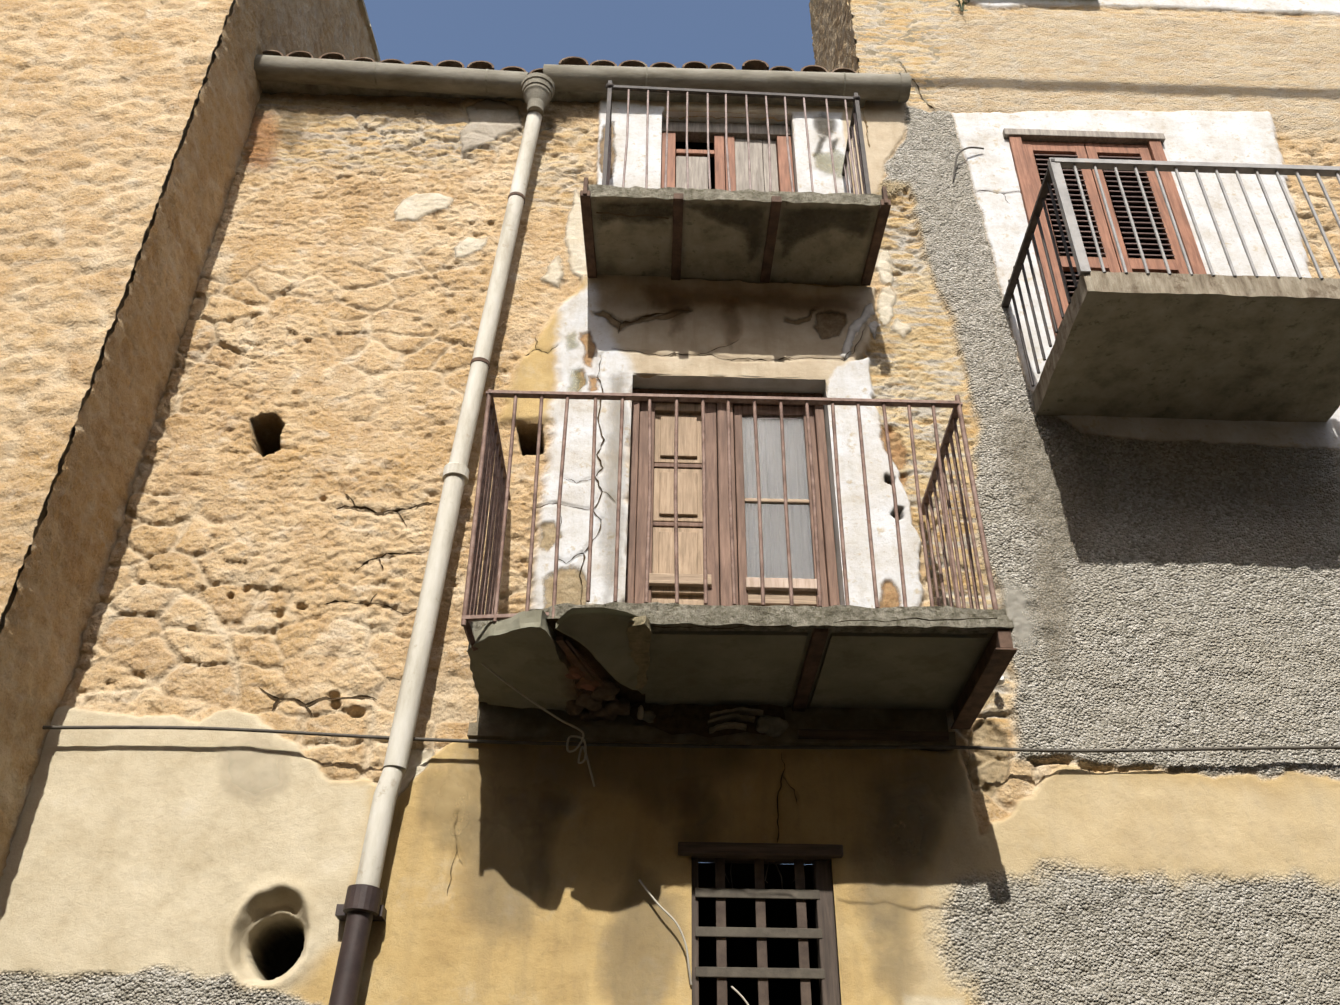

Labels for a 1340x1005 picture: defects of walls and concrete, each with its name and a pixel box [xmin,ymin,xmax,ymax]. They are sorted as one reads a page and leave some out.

leakage [598,204,673,223]
leakage [690,206,763,260]
leakage [780,209,872,253]
crack [525,309,866,605]
crack [324,494,437,614]
spalling [539,522,562,551]
spalling [544,568,789,738]
crack [777,753,798,842]